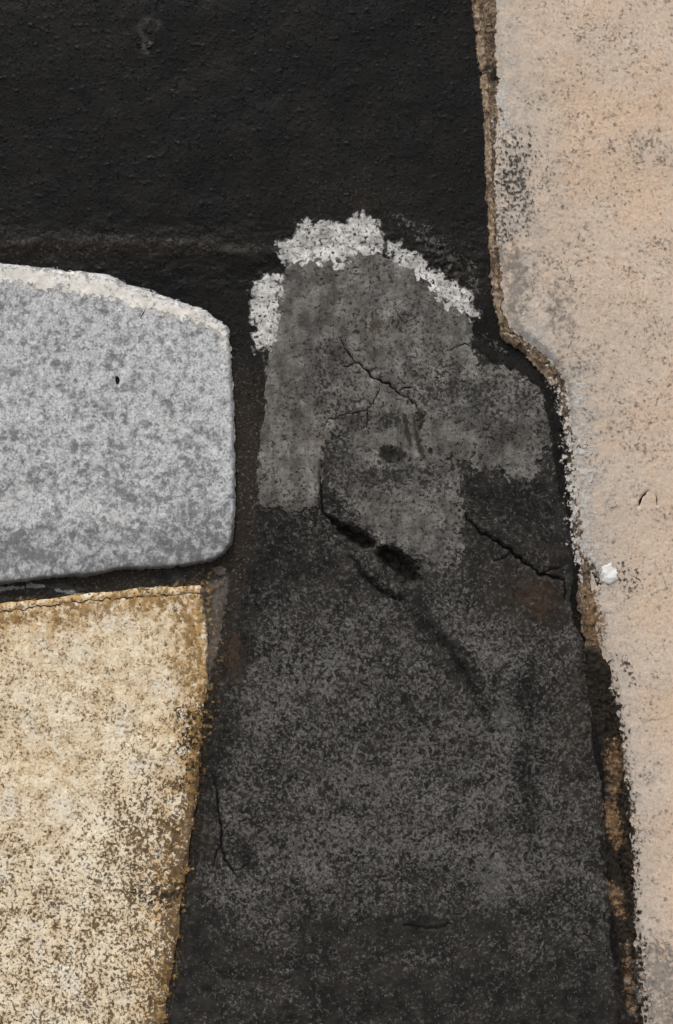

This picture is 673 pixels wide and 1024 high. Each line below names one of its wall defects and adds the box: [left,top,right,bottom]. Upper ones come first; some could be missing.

crack [324,339,418,429]
crack [320,463,331,520]
crack [465,515,567,600]
crack [212,775,248,883]